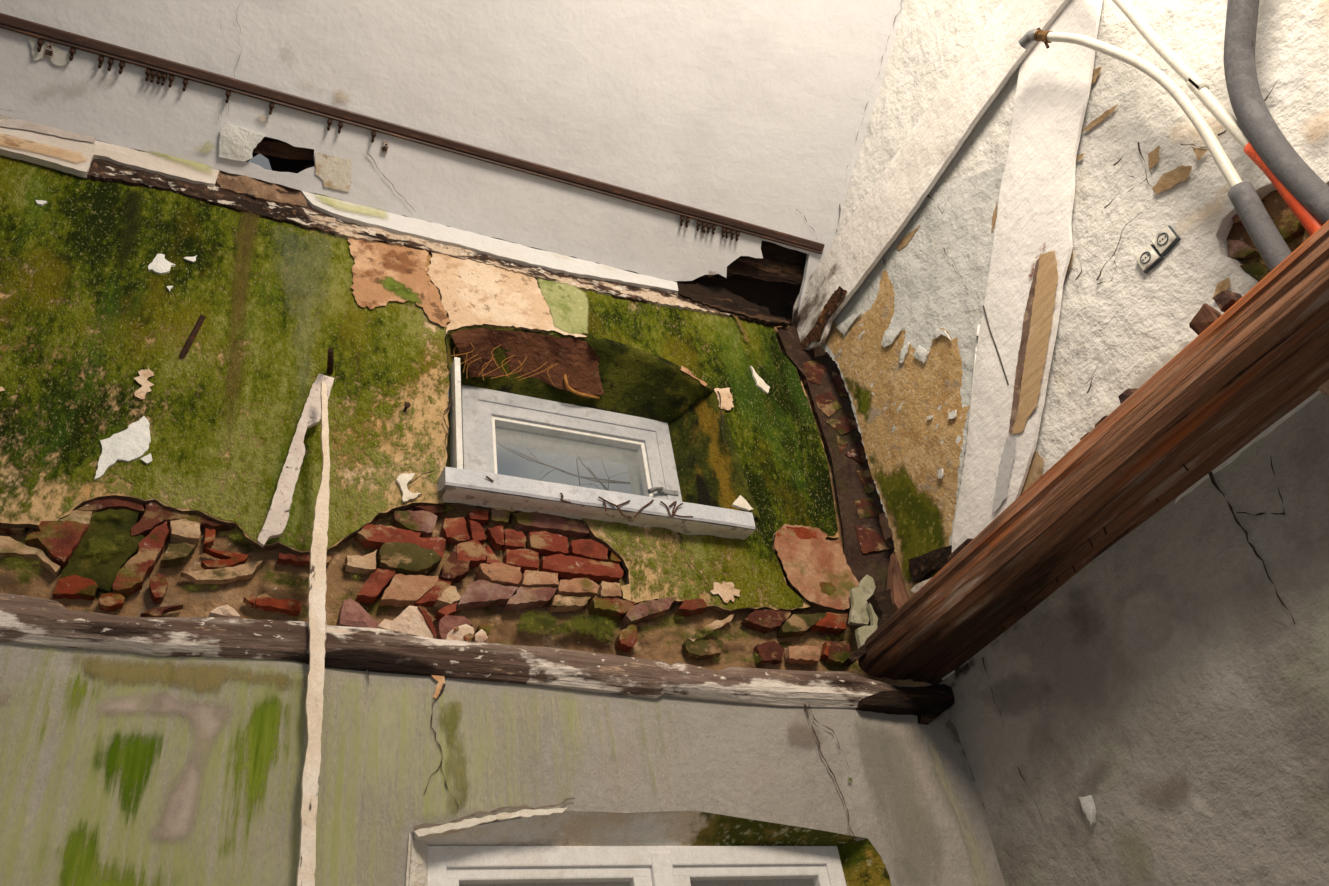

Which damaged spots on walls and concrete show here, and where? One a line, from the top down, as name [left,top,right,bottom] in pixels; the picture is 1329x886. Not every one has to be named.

spalling [216,125,307,208]
spalling [315,153,352,192]
peeling [148,254,197,292]
flaking render [1212,214,1270,299]
flaking render [1274,206,1305,243]
peeling [94,416,152,481]
flaking render [134,367,154,399]
flaking render [326,164,1005,667]
flaking render [0,497,310,618]
crack [1209,456,1295,624]
water stain [101,693,228,840]
crack [804,705,858,843]